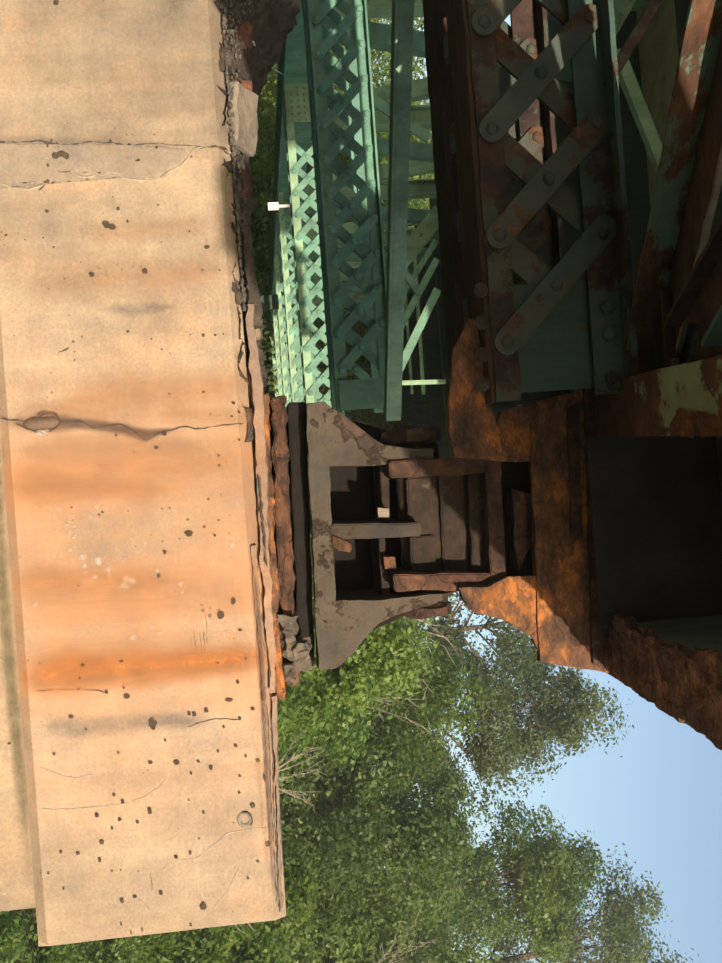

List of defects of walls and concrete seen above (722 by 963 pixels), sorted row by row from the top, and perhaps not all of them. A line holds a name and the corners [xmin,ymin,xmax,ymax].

crack [0,139,201,147]
crack [1,414,244,440]
corrosion [669,399,722,438]